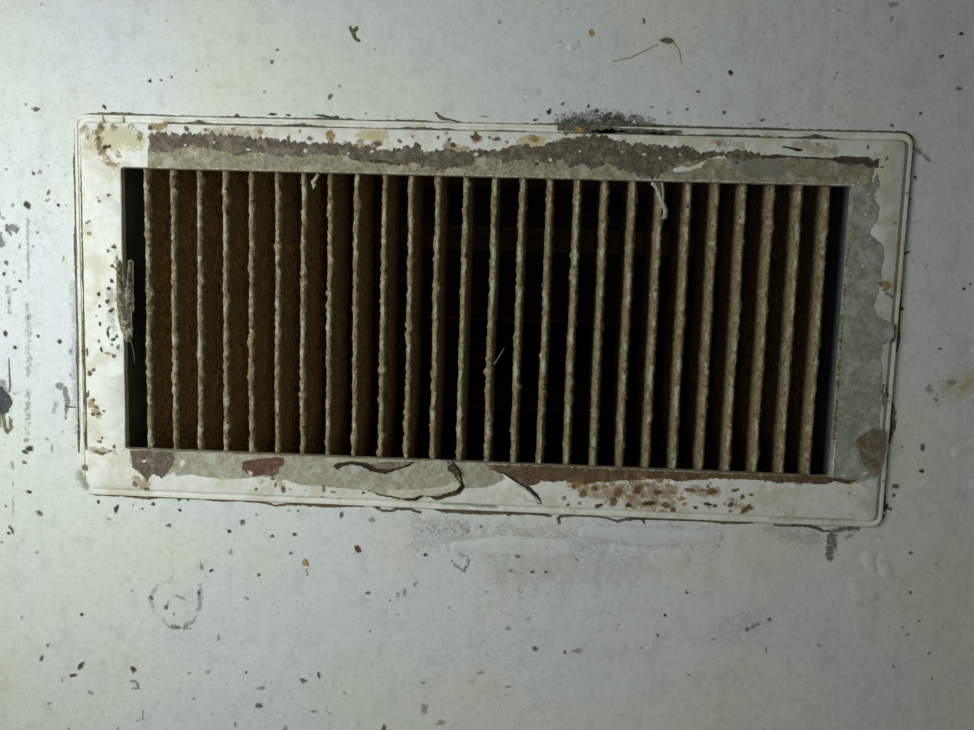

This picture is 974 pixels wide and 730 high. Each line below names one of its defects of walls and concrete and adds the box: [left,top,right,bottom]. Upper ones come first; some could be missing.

rust [326,126,414,148]
rust [437,132,546,152]
peeling [147,131,895,483]
peeling [129,450,505,501]
rust [486,464,856,514]